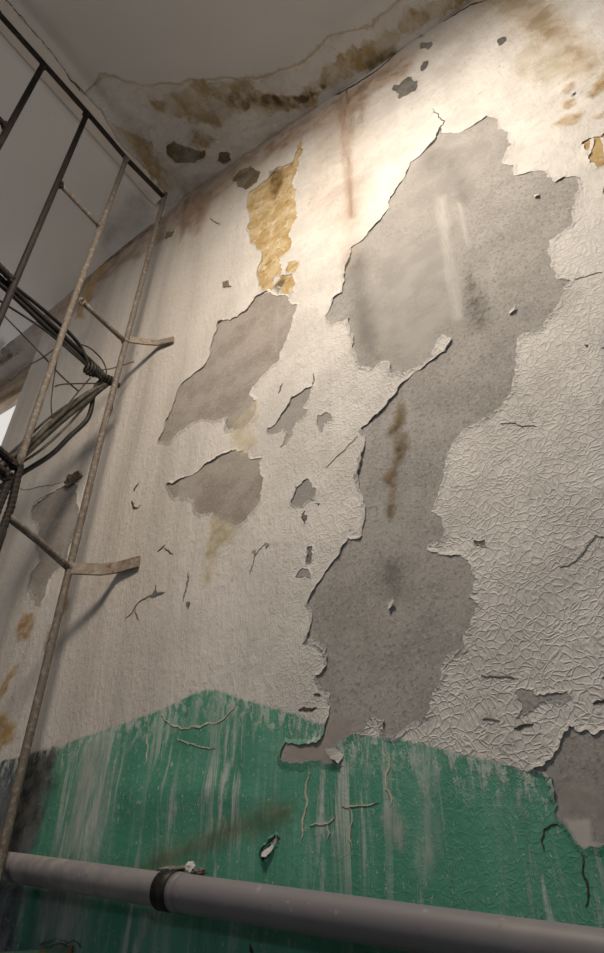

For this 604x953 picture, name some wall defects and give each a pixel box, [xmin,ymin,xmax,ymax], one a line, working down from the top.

leakage [85,0,413,204]
spalling [391,35,434,100]
leakage [491,0,595,67]
peeling [157,139,305,446]
peeling [26,482,88,606]
peeling [165,447,267,529]
peeling [266,383,334,447]
rust [384,405,406,484]
peeling [277,114,583,772]
peeling [527,720,604,858]